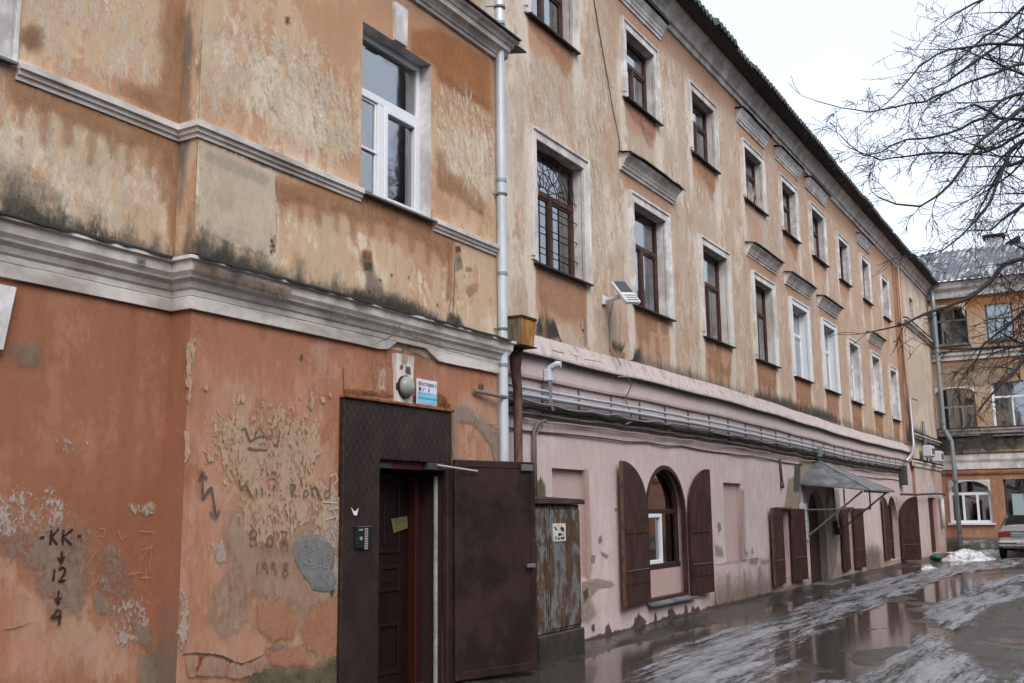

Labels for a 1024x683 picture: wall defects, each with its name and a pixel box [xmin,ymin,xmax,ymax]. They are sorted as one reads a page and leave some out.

peeling [193,5,360,162]
water stain [2,195,151,265]
water stain [12,83,179,257]
water stain [192,236,464,326]
flaking render [185,339,208,402]
peeling [0,484,156,647]
peeling [177,391,339,679]
crack [183,652,265,665]